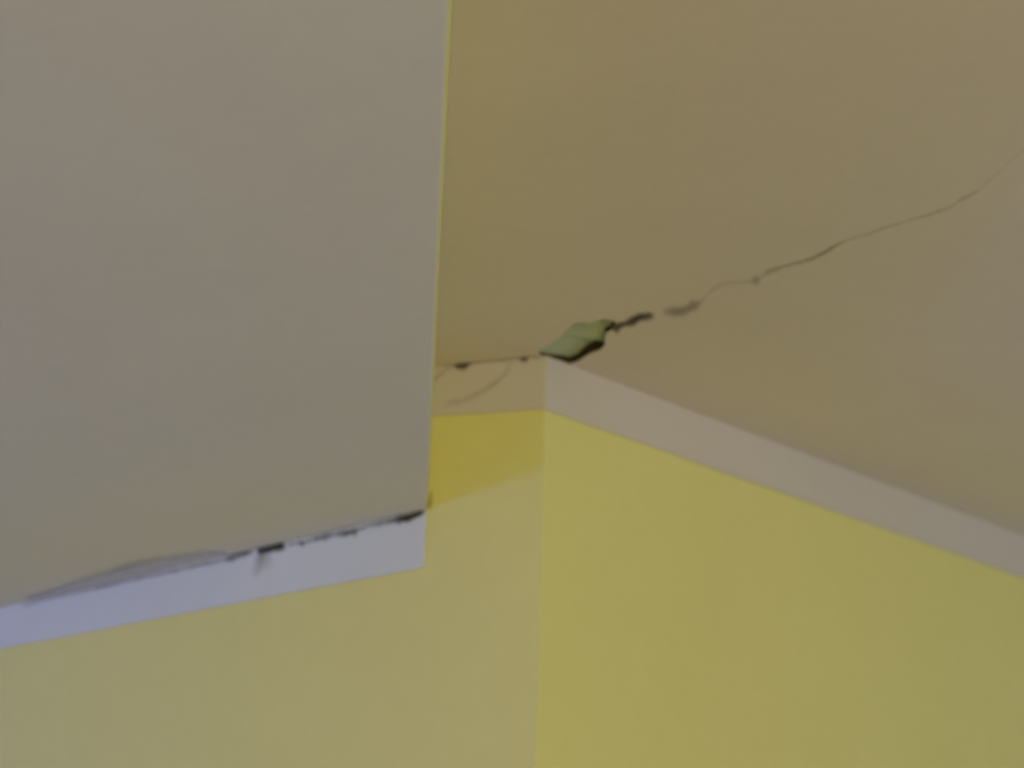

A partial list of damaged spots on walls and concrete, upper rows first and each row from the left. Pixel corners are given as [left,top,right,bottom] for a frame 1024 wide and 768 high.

crack [612,314,651,331]
flaking render [539,319,614,364]
crack [455,362,471,370]
crack [393,510,423,523]
crack [229,529,355,559]